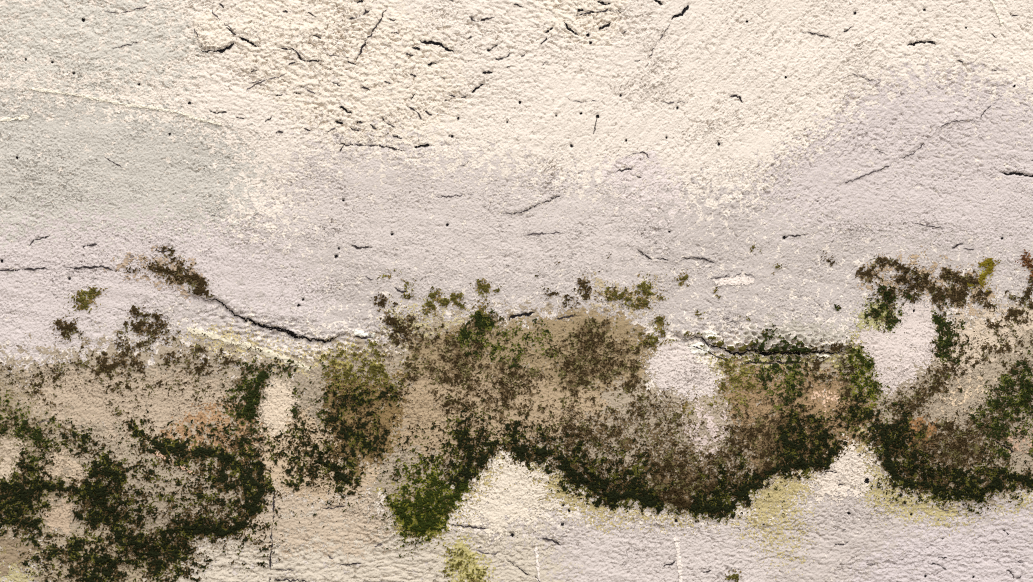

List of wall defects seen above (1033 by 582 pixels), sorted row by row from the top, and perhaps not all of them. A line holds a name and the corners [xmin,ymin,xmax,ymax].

crack [196,297,407,343]
crack [689,336,846,365]
leakage [142,470,1033,582]
leakage [0,548,64,582]